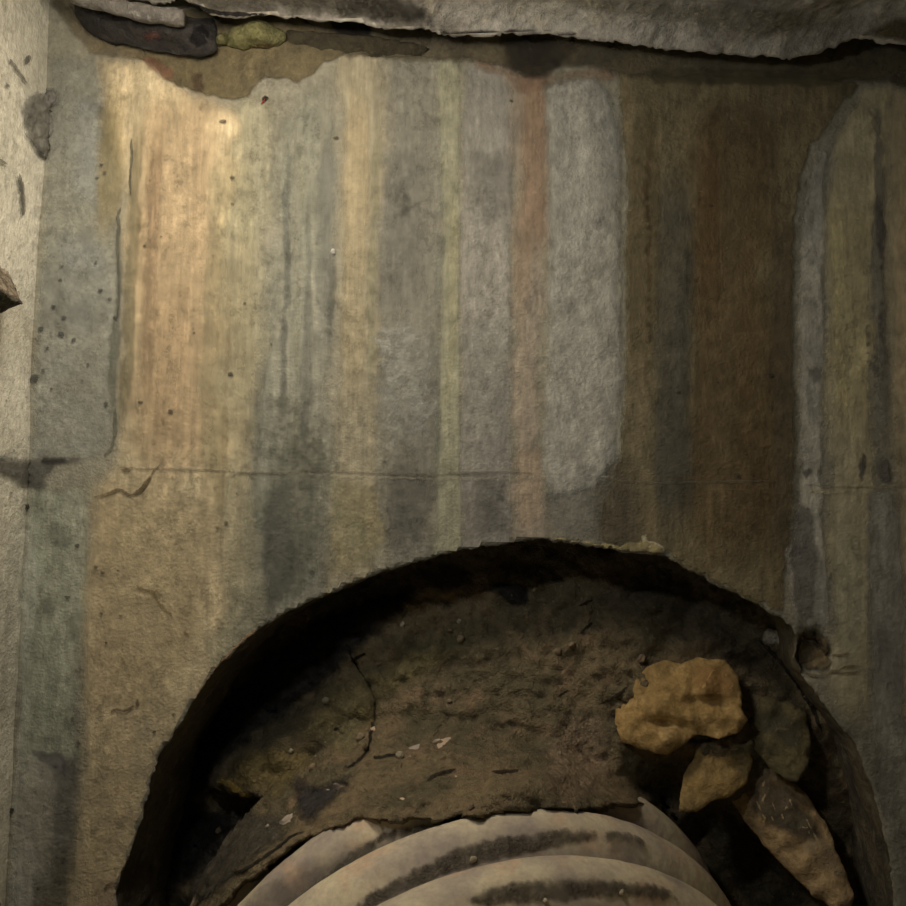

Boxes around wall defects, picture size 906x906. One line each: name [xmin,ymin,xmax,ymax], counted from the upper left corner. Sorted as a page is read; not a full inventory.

spalling [74,5,218,57]
crack [136,585,189,636]
damp [50,0,369,429]
corrosion [478,62,549,537]
damp [184,0,906,906]
spalling [556,536,664,552]